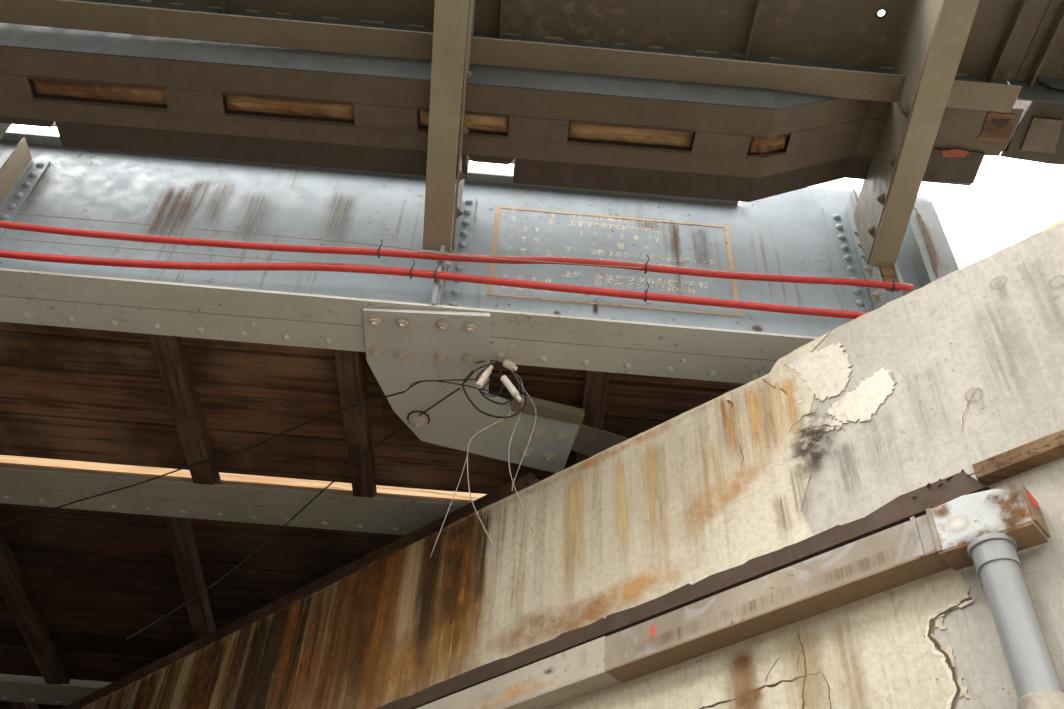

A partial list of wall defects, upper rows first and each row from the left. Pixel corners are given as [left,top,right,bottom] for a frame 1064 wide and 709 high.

rust [914,207,939,277]
rust [721,400,736,450]
rust [745,381,797,443]
crack [763,379,788,395]
crack [789,407,840,434]
peeling [775,343,898,466]
rust [992,490,1027,529]
crack [699,629,832,709]